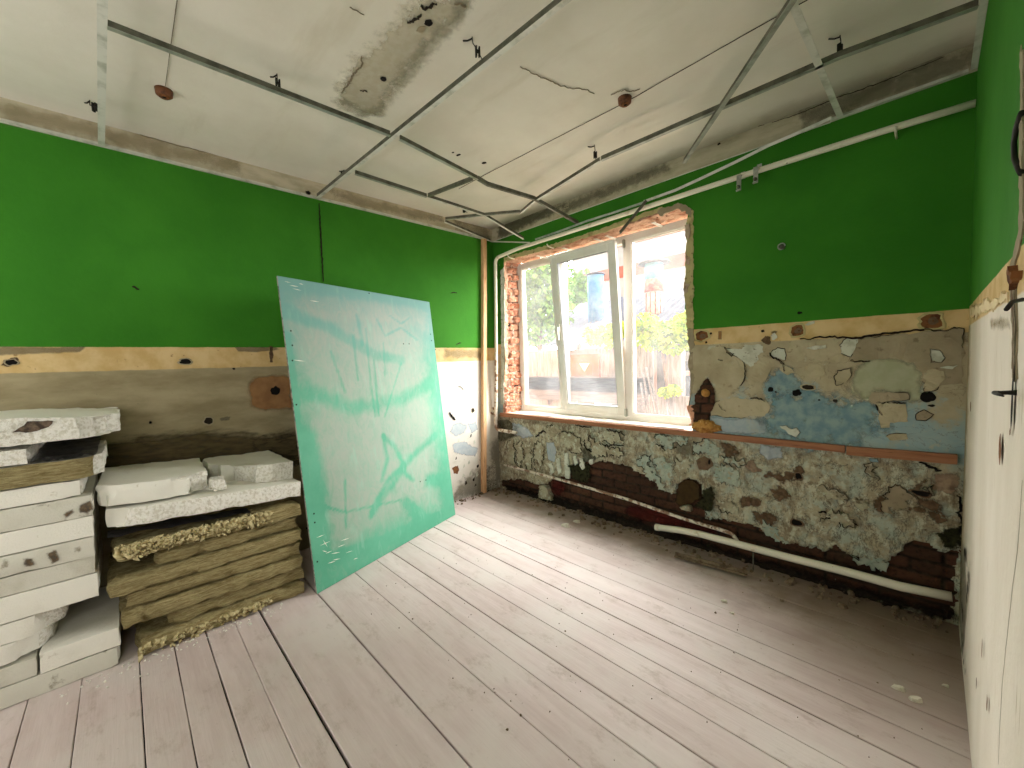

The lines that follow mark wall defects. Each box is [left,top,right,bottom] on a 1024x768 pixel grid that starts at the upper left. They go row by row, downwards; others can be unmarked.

water stain [340,0,465,113]
crack [459,16,777,189]
spalling [969,45,1024,382]
flaking render [494,203,969,621]